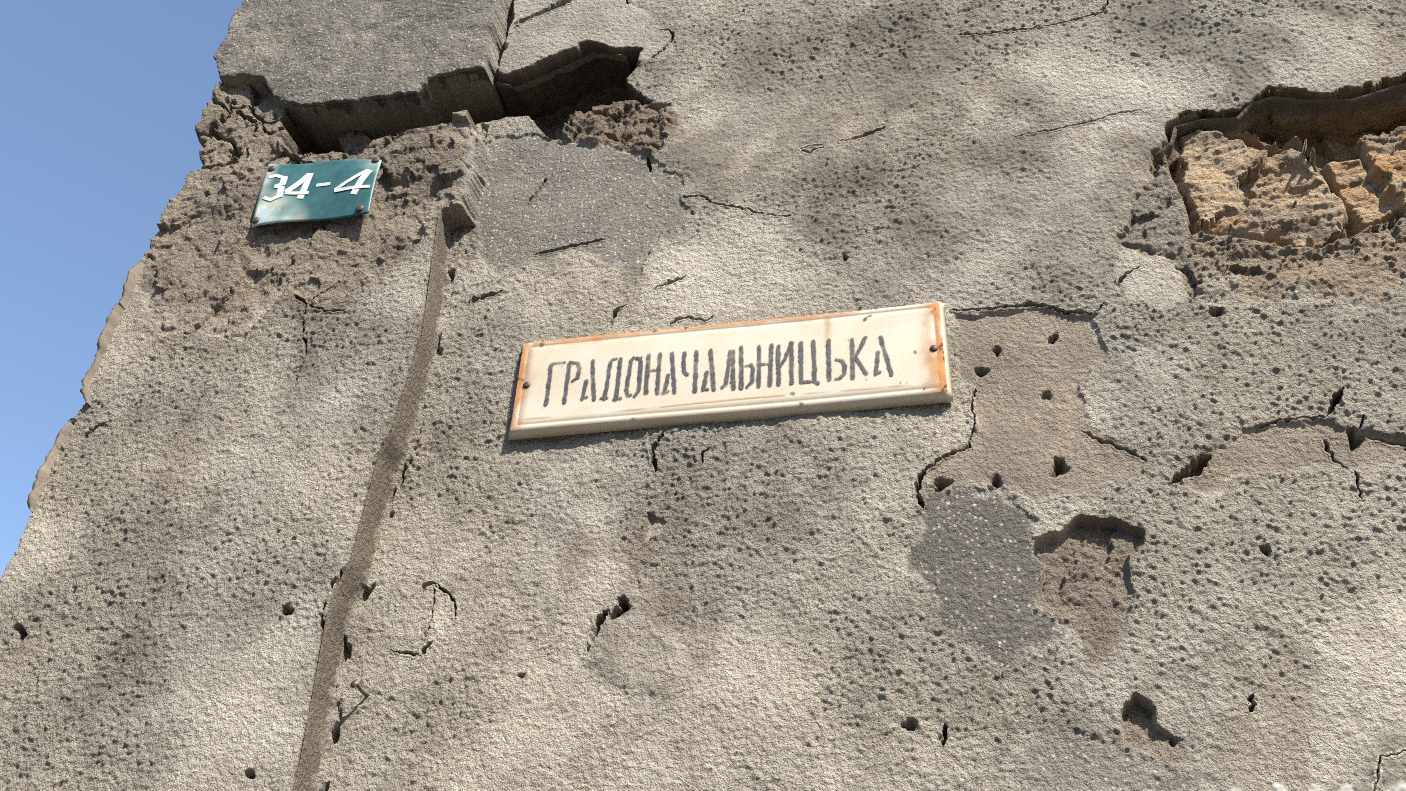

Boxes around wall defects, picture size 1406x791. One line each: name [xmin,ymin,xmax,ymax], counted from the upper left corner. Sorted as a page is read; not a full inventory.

crack [512,0,574,28]
crack [650,28,676,59]
crack [217,98,308,157]
spalling [1111,74,1406,316]
crack [290,279,347,389]
peeling [27,418,77,512]
spalling [80,40,695,791]
crack [912,386,979,510]
spalling [899,306,1148,677]
crack [1257,385,1406,500]